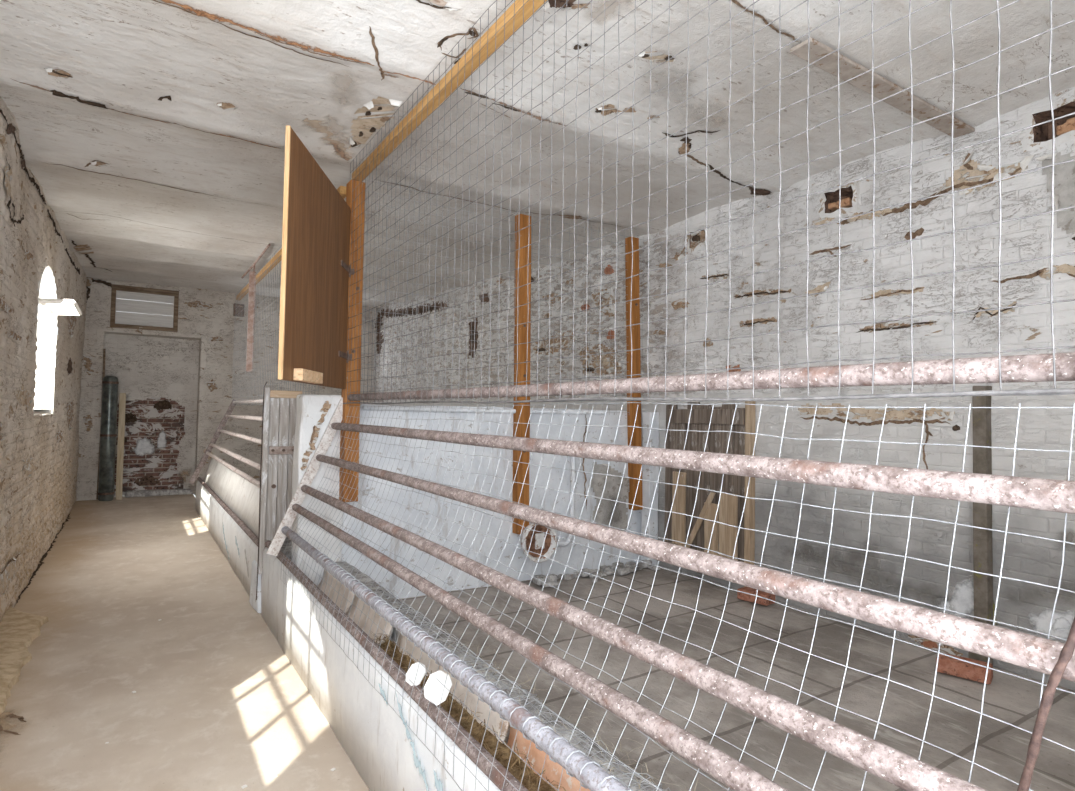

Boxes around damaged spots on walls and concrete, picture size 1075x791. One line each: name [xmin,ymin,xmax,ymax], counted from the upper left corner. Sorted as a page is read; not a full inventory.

peeling [416,0,461,11]
crack [369,26,385,81]
peeling [348,96,403,149]
crack [662,130,772,196]
spalling [935,96,1075,196]
crack [0,109,274,303]
spalling [812,181,861,227]
spalling [375,301,448,354]
flaking render [114,396,185,492]
peeling [798,403,960,431]